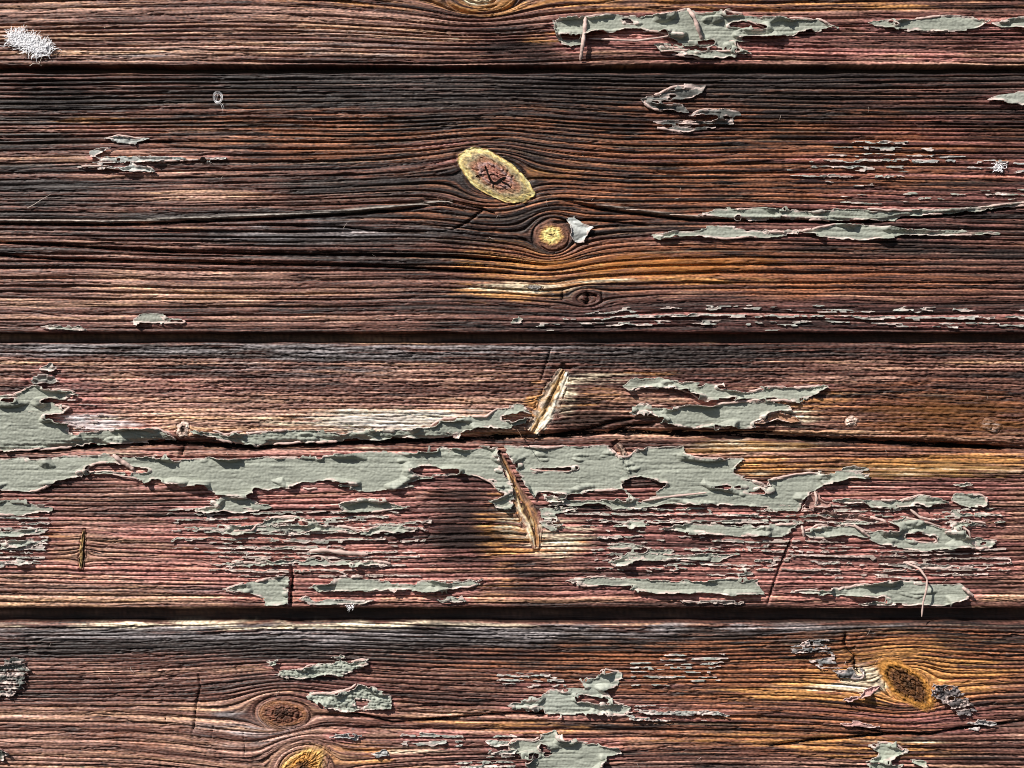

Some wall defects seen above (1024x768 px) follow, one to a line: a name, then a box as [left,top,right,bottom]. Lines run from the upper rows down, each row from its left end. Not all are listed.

peeling [552,8,839,60]
peeling [868,15,1024,33]
peeling [641,83,741,133]
peeling [77,134,226,173]
peeling [651,140,1024,241]
peeling [0,362,1012,617]
peeling [267,655,392,713]
peeling [791,639,865,680]
peeling [456,653,730,768]